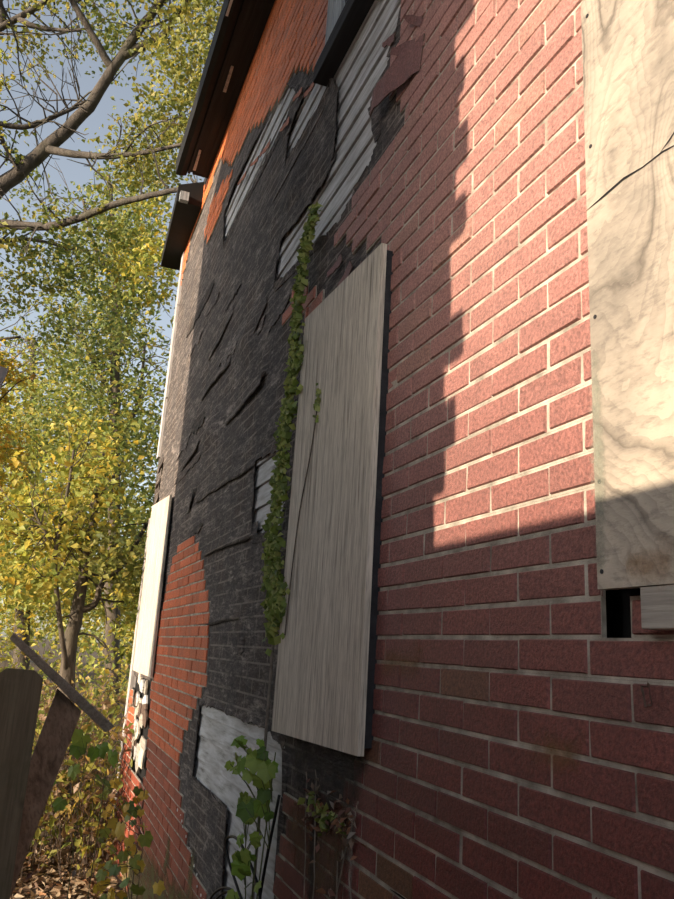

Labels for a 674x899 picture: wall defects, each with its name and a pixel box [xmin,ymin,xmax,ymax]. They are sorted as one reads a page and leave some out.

peeling [223,78,338,249]
peeling [353,166,369,192]
peeling [368,106,381,143]
peeling [186,279,241,359]
peeling [267,223,338,332]
peeling [175,411,205,461]
spalling [131,673,152,783]
peeling [192,697,288,899]